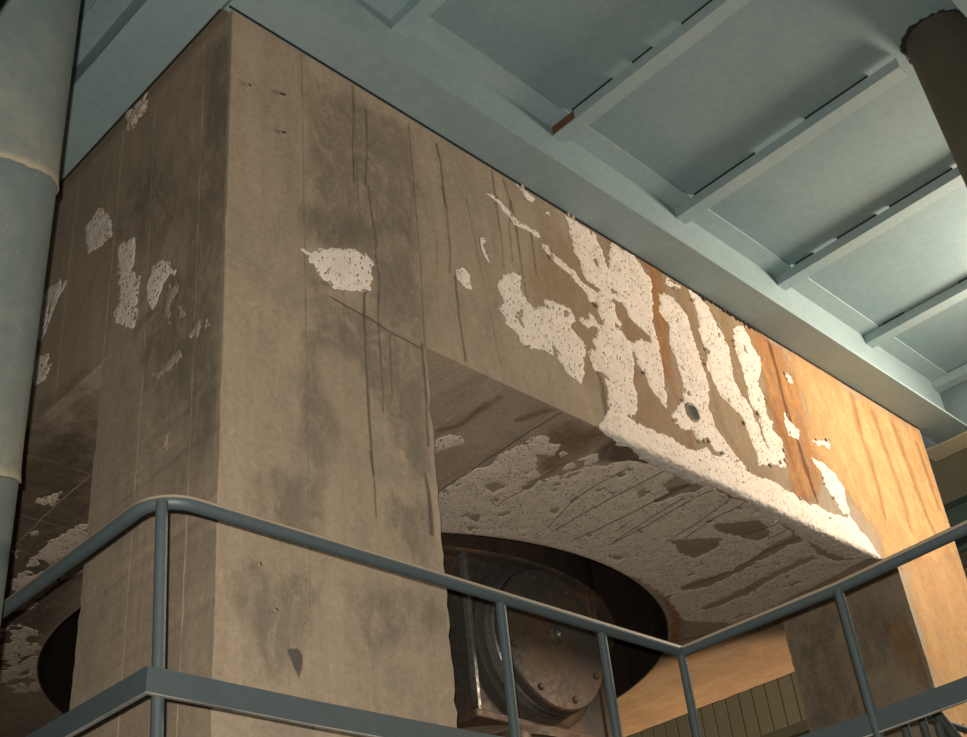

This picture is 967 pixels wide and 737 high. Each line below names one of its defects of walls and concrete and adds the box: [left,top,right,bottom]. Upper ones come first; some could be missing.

peeling [83,208,186,329]
peeling [301,247,375,293]
peeling [37,279,67,342]
crack [329,296,420,348]
peeling [32,353,52,386]
peeling [434,193,881,624]
corrosion [747,329,950,557]
crack [547,467,745,545]
peeling [10,524,88,596]
corrosion [911,541,967,684]
peeling [0,624,41,694]
corrosion [950,702,967,737]